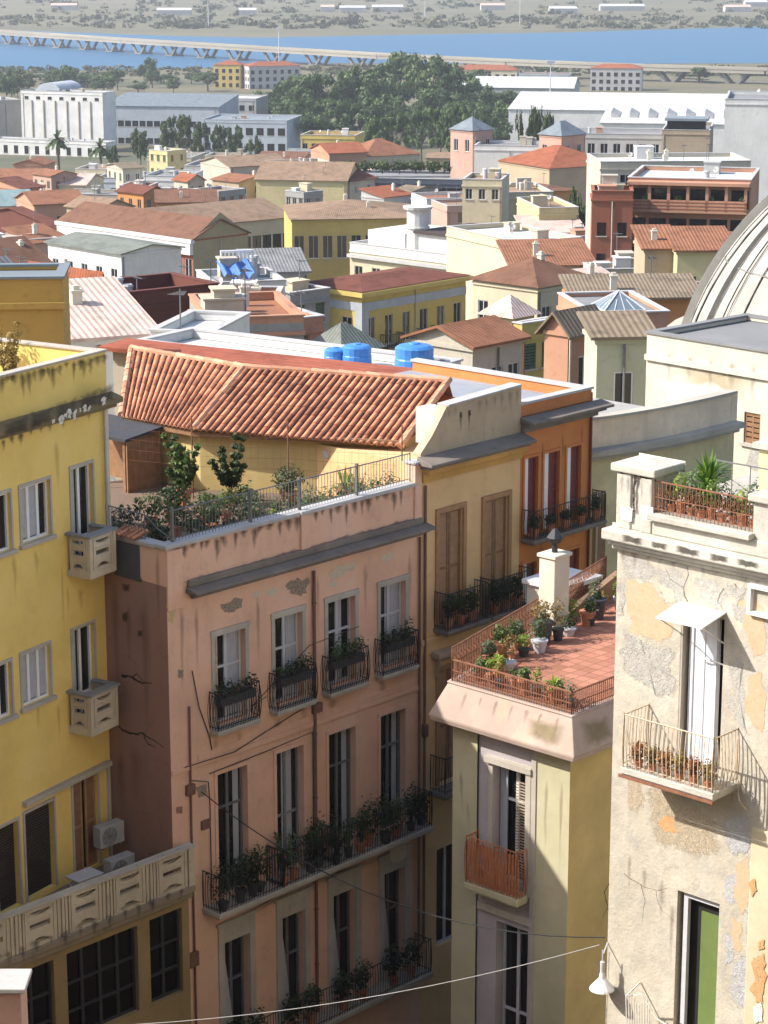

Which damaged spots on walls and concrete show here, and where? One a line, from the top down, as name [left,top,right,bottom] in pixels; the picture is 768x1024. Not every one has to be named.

peeling [220,577,310,613]
spalling [616,555,767,734]
crack [121,674,152,684]
crack [119,726,164,748]
crack [604,873,670,918]
spalling [626,779,767,1023]